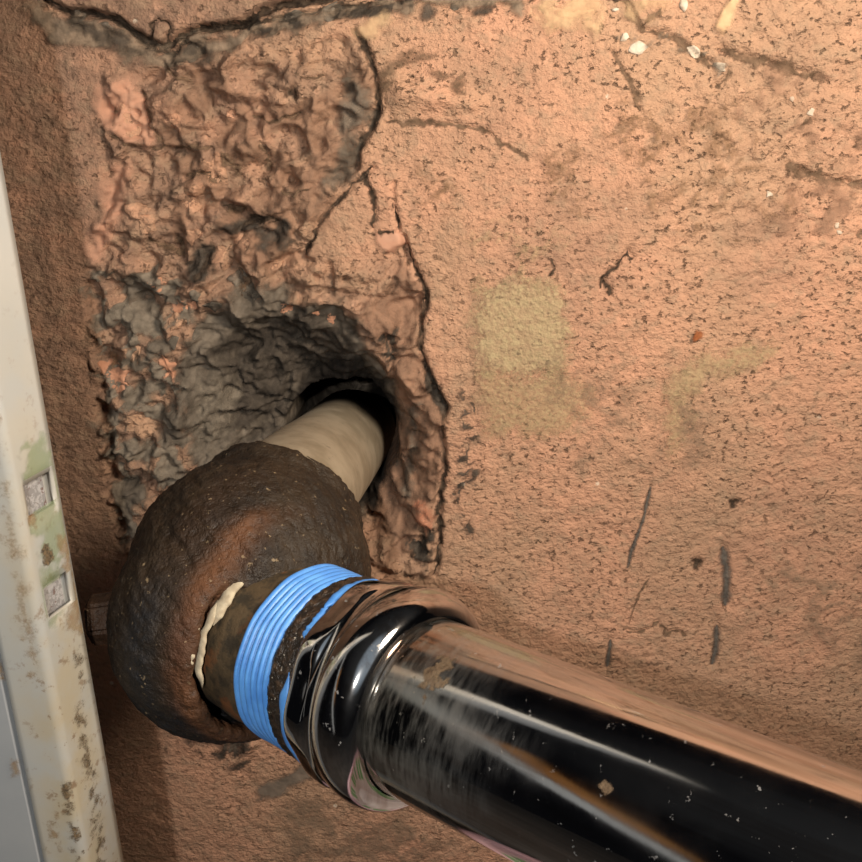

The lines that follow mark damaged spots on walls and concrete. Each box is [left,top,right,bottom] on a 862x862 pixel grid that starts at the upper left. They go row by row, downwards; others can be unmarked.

crack [51,0,380,56]
flaking render [26,0,524,84]
crack [109,90,170,150]
flaking render [81,70,481,563]
crack [306,32,530,575]